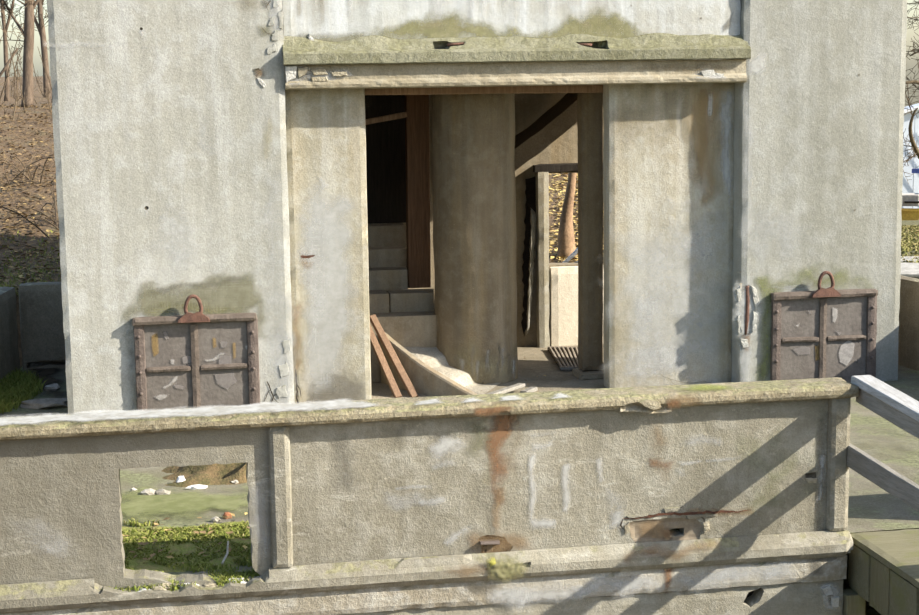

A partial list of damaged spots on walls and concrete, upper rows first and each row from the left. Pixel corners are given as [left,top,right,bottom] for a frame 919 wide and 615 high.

water stain [126,276,263,320]
spalling [736,283,760,350]
rust [476,407,513,480]
spalling [624,517,711,543]